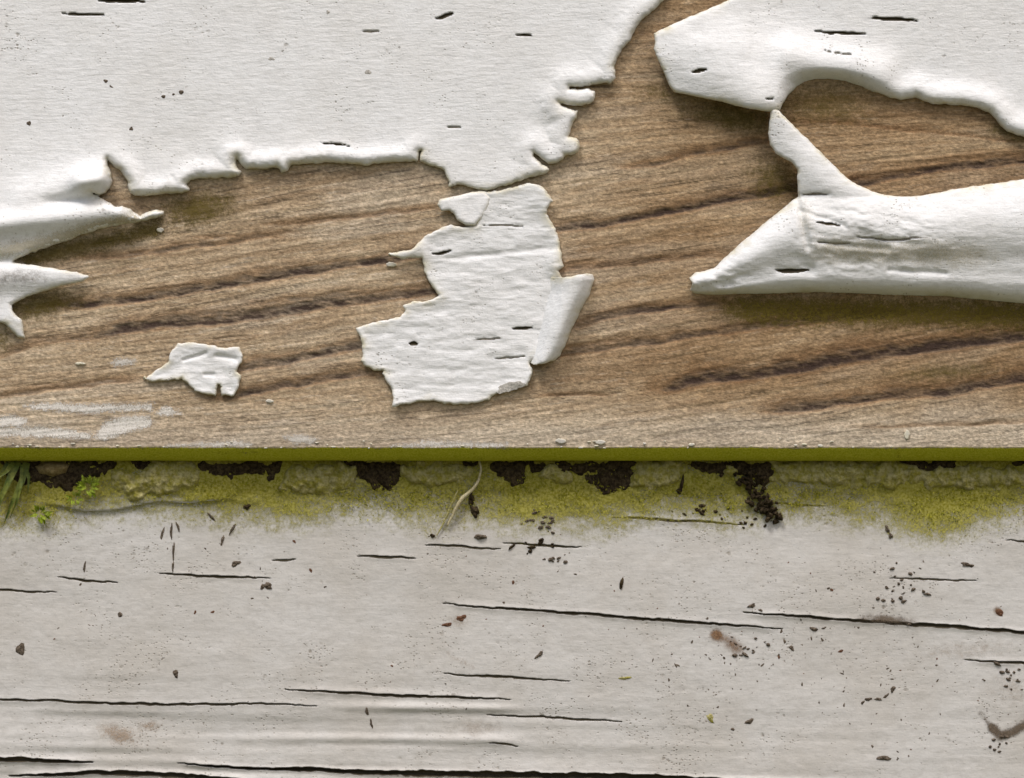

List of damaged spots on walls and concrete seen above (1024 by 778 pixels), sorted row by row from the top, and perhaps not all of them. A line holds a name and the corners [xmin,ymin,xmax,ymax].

peeling [654,0,1024,303]
peeling [0,0,664,407]
crack [159,559,295,579]
crack [357,543,577,559]
crack [443,603,1024,634]
crack [0,673,622,722]
crack [0,742,718,778]